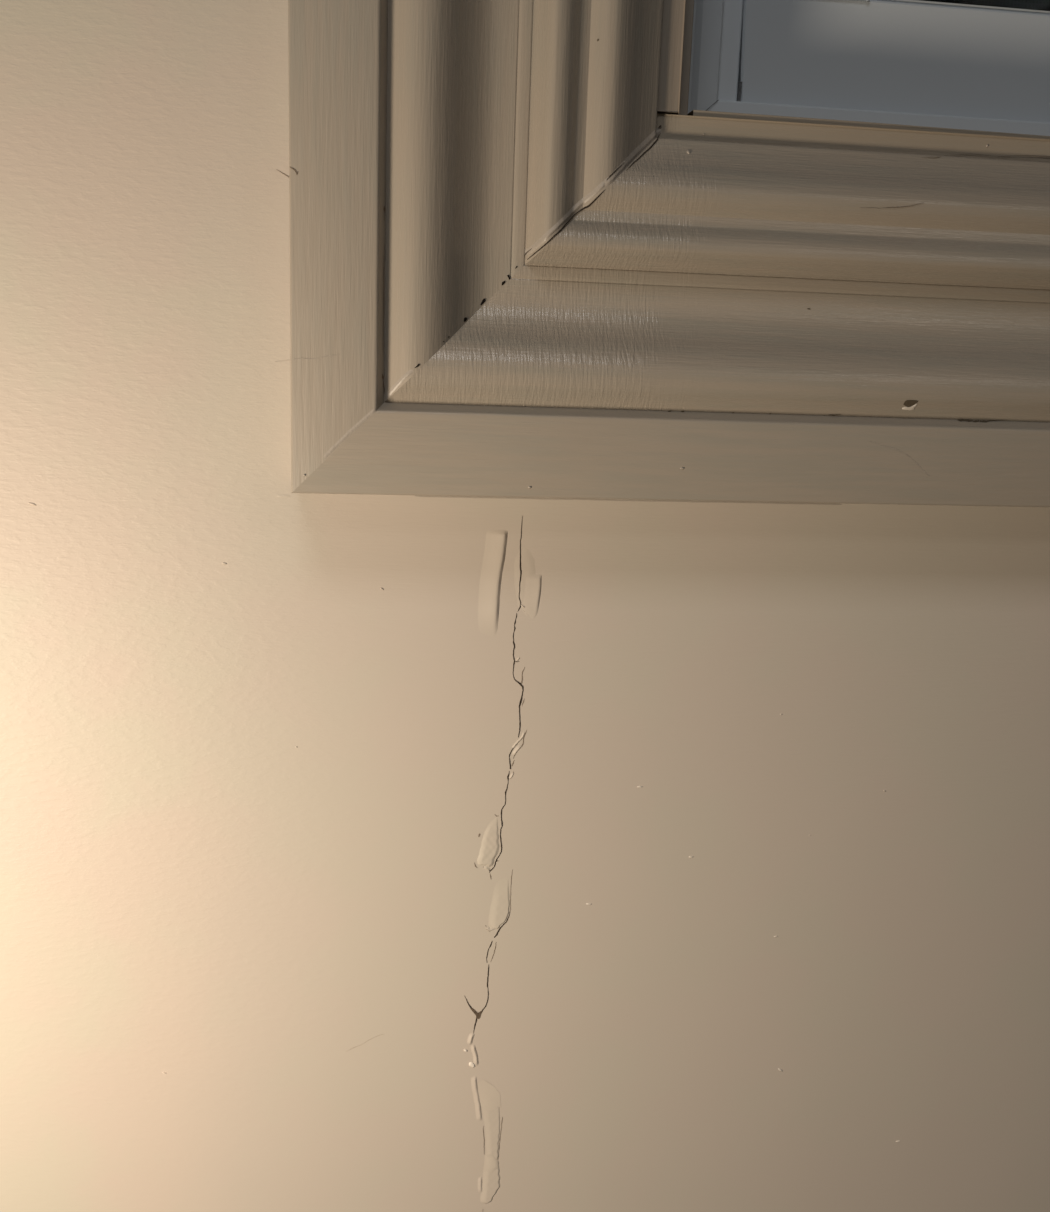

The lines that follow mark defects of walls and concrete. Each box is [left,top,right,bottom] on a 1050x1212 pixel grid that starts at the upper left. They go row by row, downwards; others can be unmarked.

crack [465,517,527,1193]